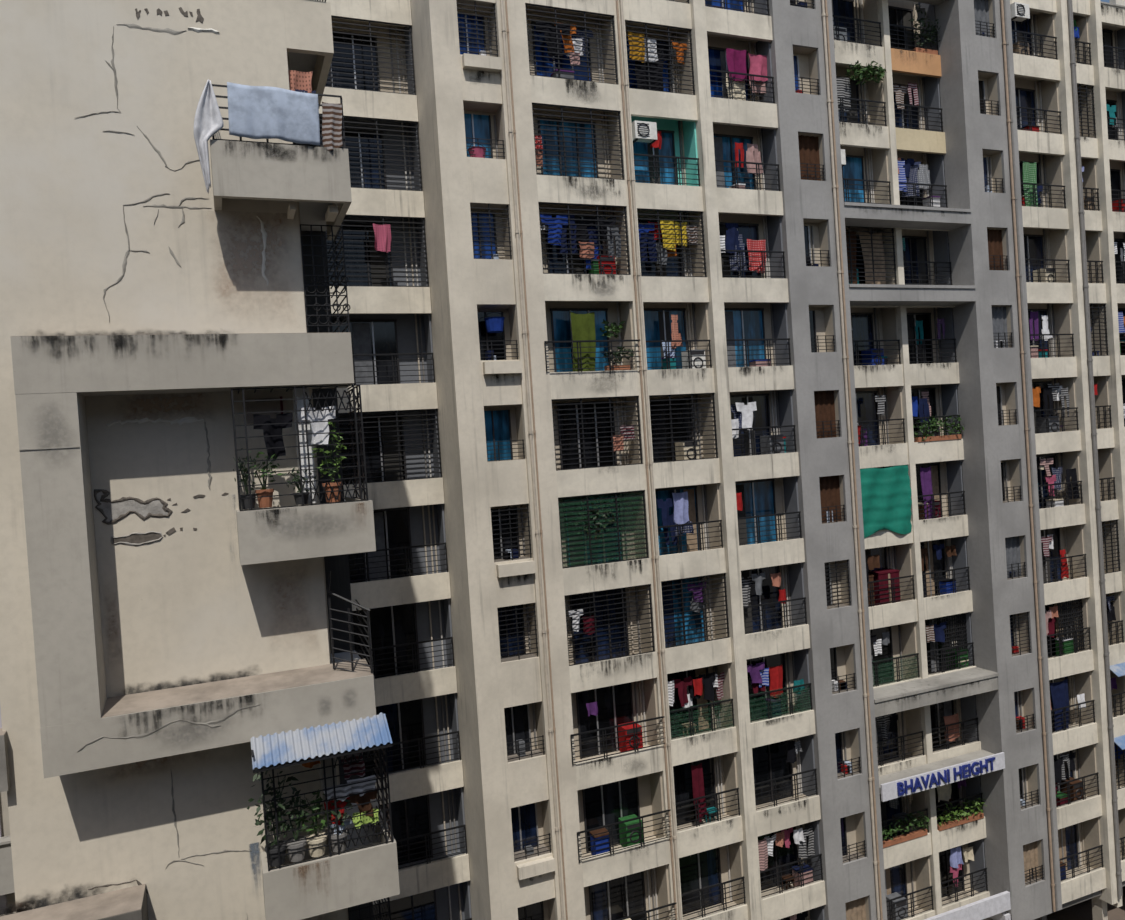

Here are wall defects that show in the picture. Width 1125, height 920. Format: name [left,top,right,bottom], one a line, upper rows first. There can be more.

crack [76,24,210,322]
water stain [89,332,199,348]
spalling [94,489,205,546]
crack [166,772,252,868]
water stain [0,888,97,917]